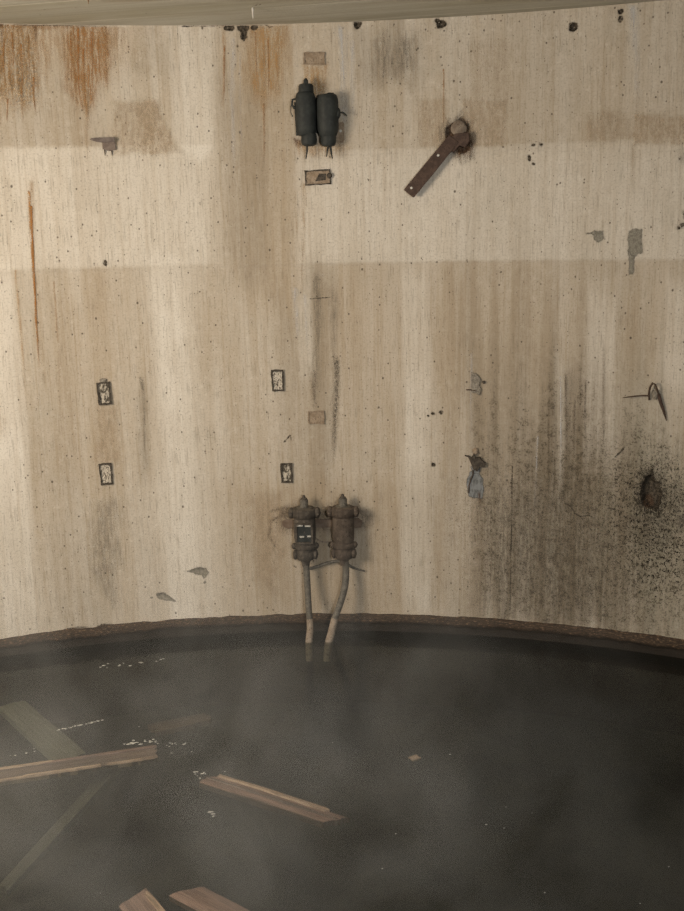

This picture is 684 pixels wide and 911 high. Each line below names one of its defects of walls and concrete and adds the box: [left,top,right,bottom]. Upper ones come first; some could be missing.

rust [0,26,42,112]
rust [66,27,110,109]
rust [28,191,38,345]
mould [613,459,684,588]